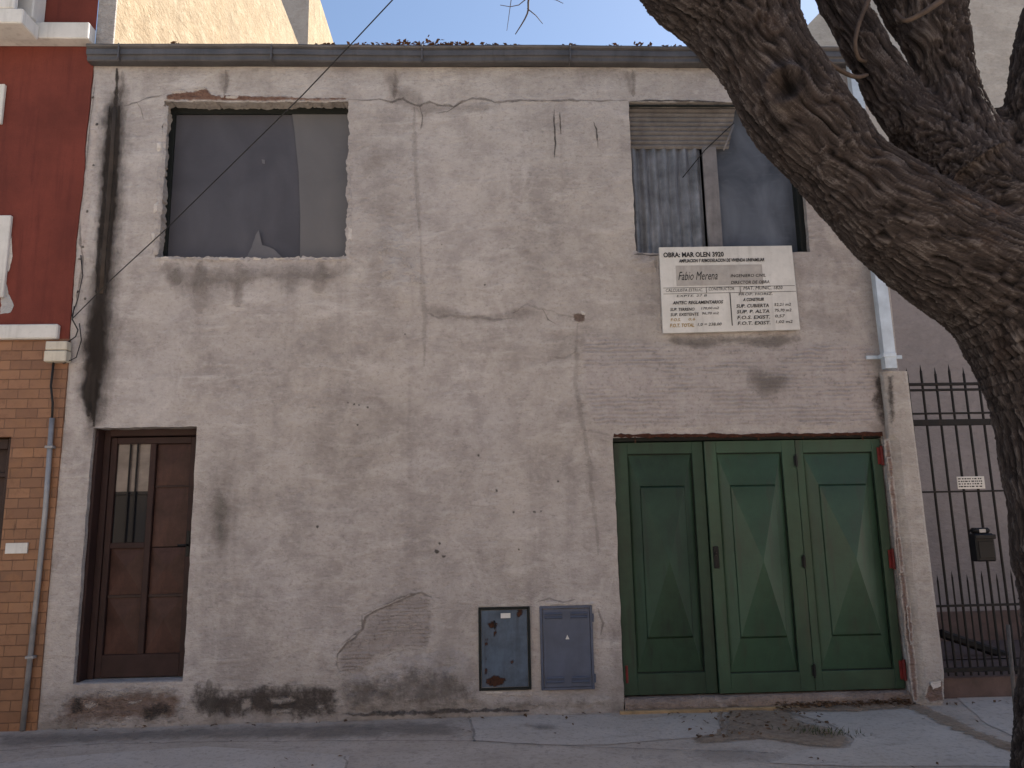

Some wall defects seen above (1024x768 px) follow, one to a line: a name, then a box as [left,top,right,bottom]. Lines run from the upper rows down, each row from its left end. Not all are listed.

flaking render [151,87,353,262]
crack [553,112,561,157]
leakage [83,68,121,427]
flaking render [330,588,435,679]
leakage [192,685,336,719]
leakage [348,708,529,717]